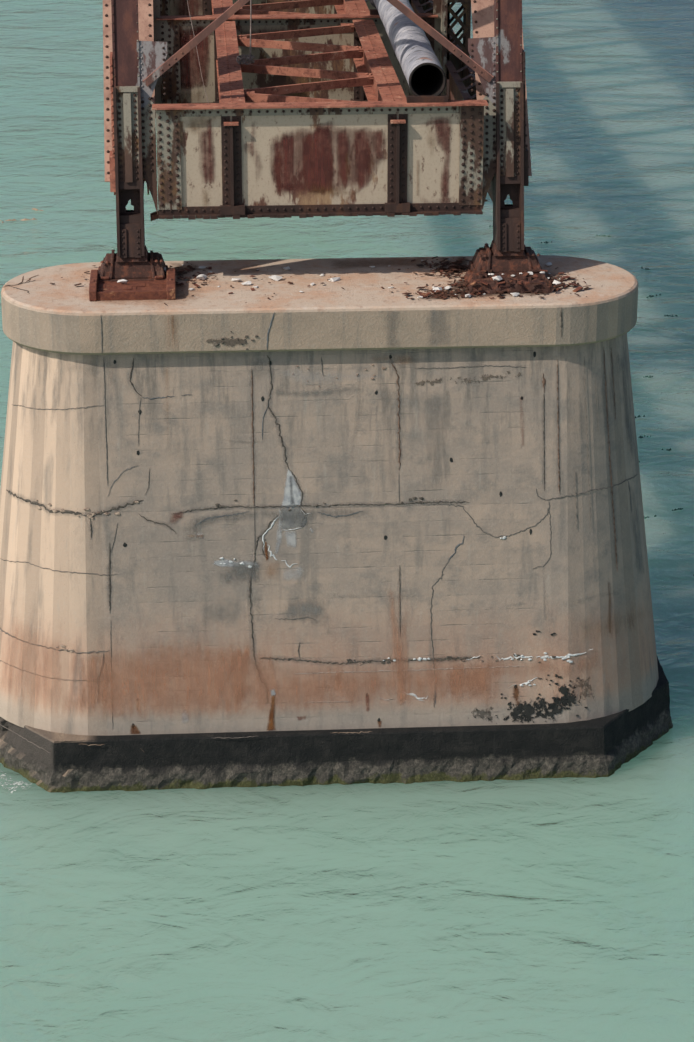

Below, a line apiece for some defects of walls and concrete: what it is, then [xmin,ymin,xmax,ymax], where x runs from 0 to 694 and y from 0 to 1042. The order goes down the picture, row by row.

rust [177,0,208,89]
rust [202,120,214,182]
rust [274,126,383,192]
rust [428,258,557,298]
crack [262,312,289,469]
spalling [262,470,310,560]
crack [0,358,637,729]
rust [267,690,275,731]
leakage [474,674,588,723]